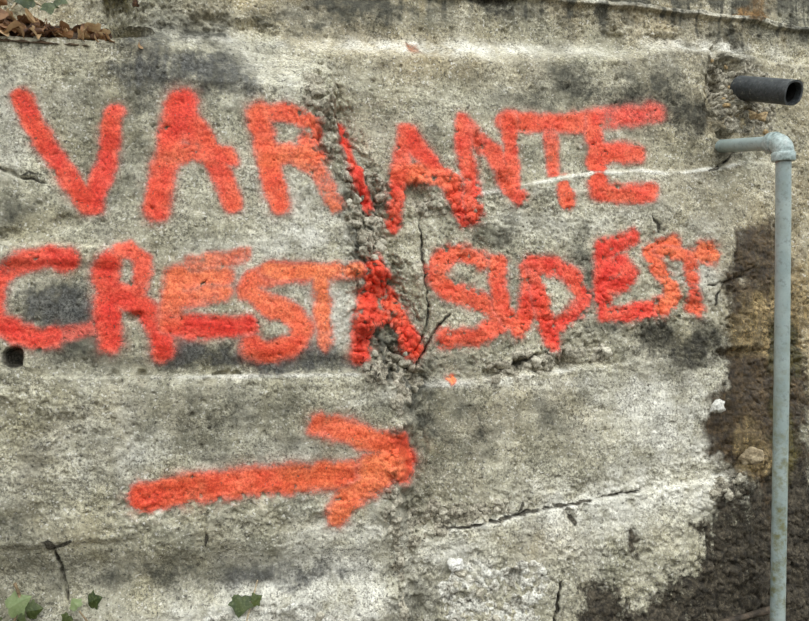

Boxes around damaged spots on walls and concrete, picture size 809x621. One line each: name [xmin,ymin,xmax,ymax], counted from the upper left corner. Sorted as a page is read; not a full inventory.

crack [405,223,450,369]
leakage [704,219,775,531]
leakage [788,275,809,515]
crack [41,540,72,600]
crack [438,488,640,529]
crack [553,582,562,621]